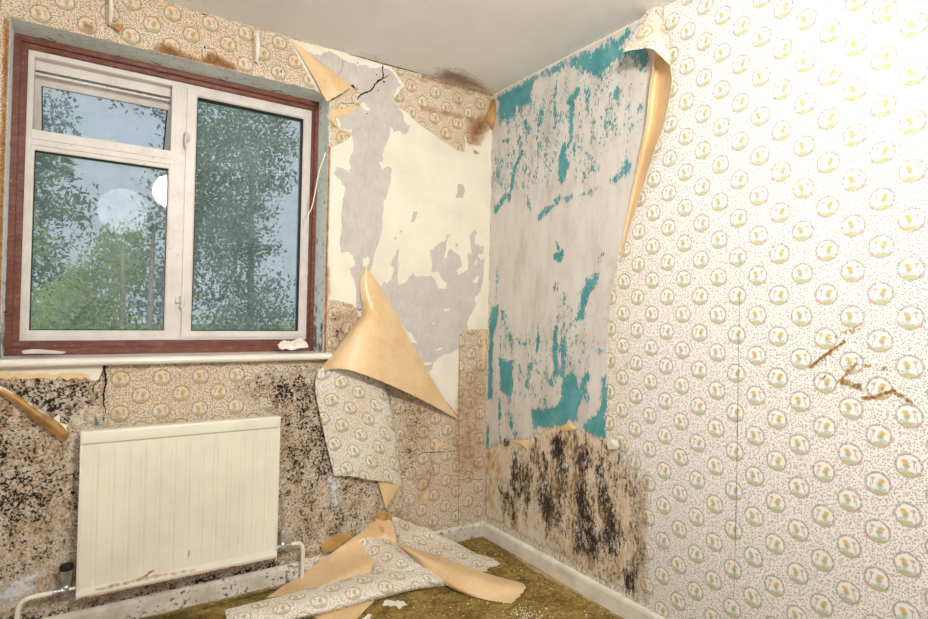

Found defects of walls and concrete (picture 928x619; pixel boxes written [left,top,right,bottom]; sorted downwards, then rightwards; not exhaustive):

damp [156,44,235,70]
crack [341,54,524,114]
damp [422,71,492,95]
damp [470,116,488,140]
damp [0,20,12,319]
peeling [289,7,672,449]
peeling [0,365,103,381]
crack [97,365,107,421]
damp [0,146,425,619]
damp [484,425,672,601]